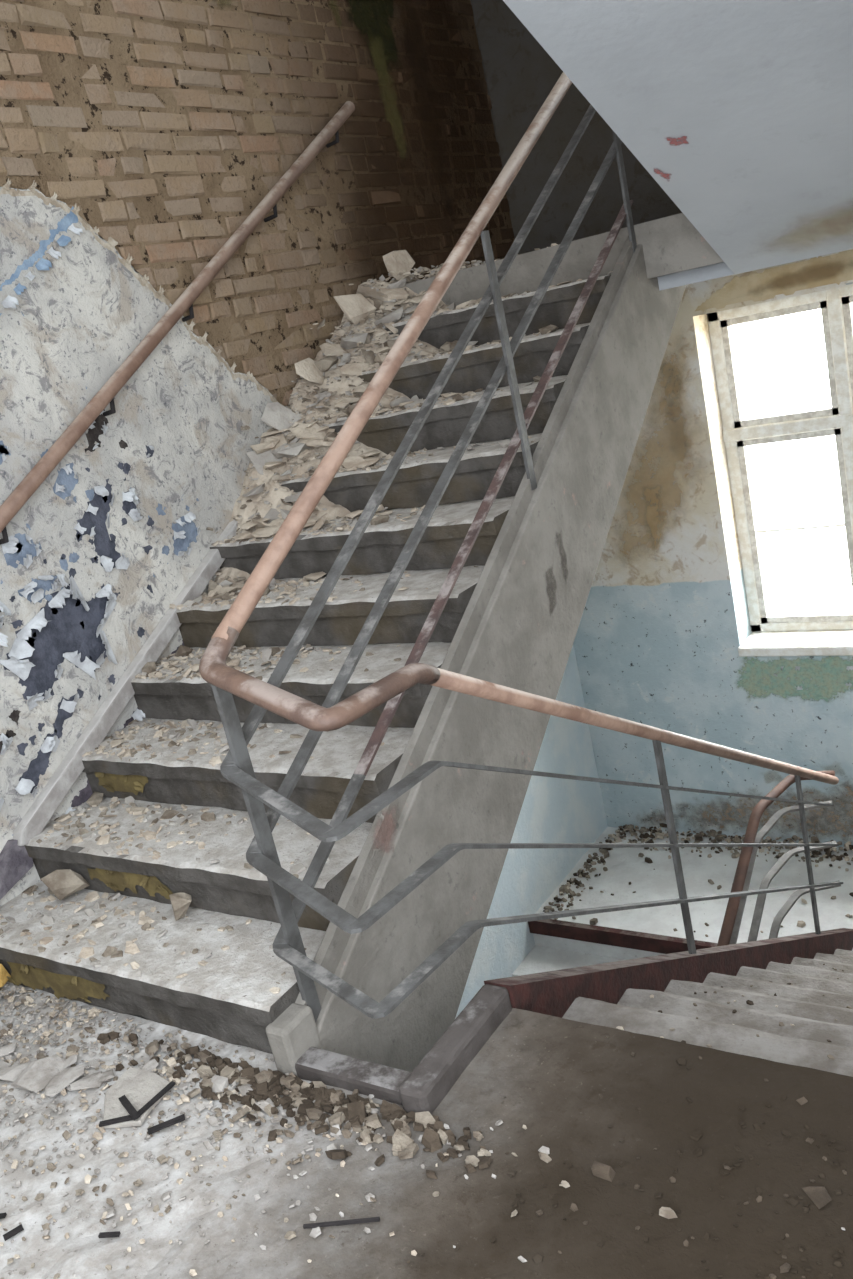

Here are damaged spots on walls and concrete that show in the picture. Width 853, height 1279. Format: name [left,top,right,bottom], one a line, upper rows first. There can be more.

peeling [0,178,170,315]
damp [623,357,691,555]
peeling [0,409,201,798]
peeling [737,656,853,702]
peeling [65,772,148,814]
peeling [87,868,173,899]